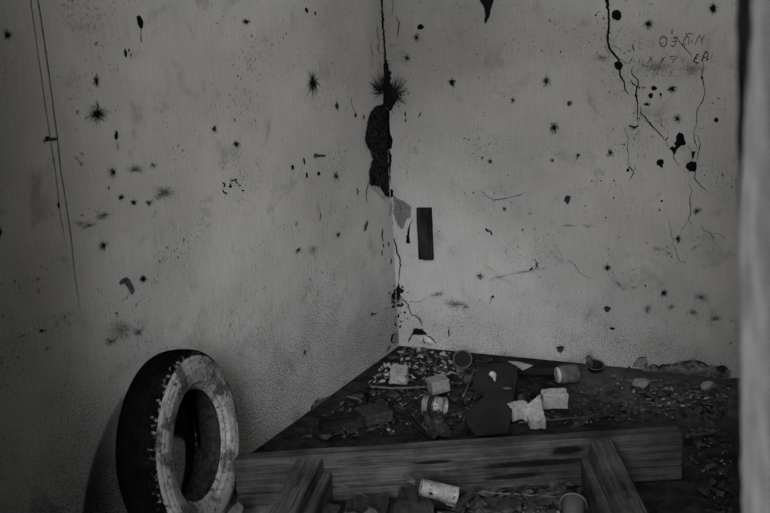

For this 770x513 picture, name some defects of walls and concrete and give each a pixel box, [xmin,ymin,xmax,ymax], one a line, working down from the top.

flaking render [357,88,411,229]
crack [605,0,668,180]
crack [668,39,726,262]
crack [381,202,424,326]